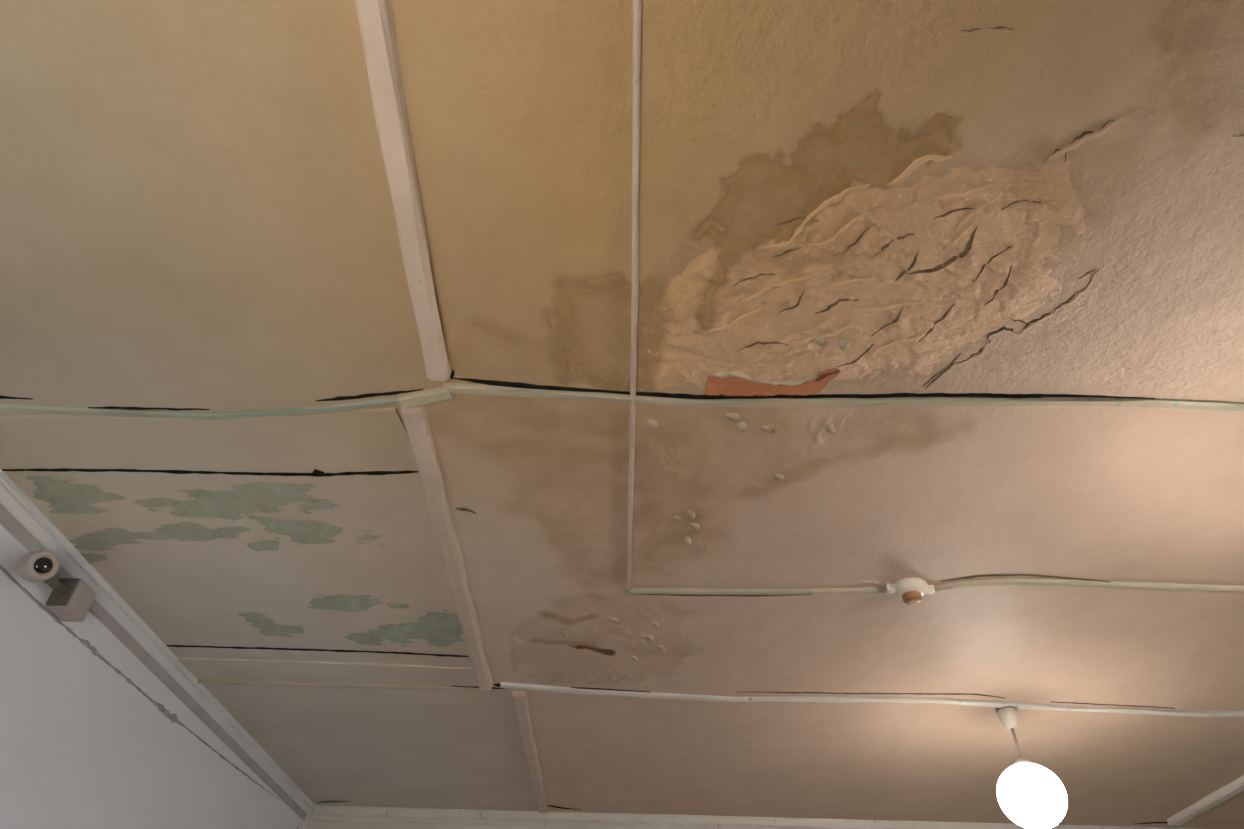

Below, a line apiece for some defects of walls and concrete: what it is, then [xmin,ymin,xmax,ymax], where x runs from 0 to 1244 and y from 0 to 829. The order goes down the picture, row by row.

crack [1044,120,1115,163]
peeling [28,477,107,514]
peeling [71,483,340,563]
peeling [309,596,407,611]
peeling [347,610,464,646]